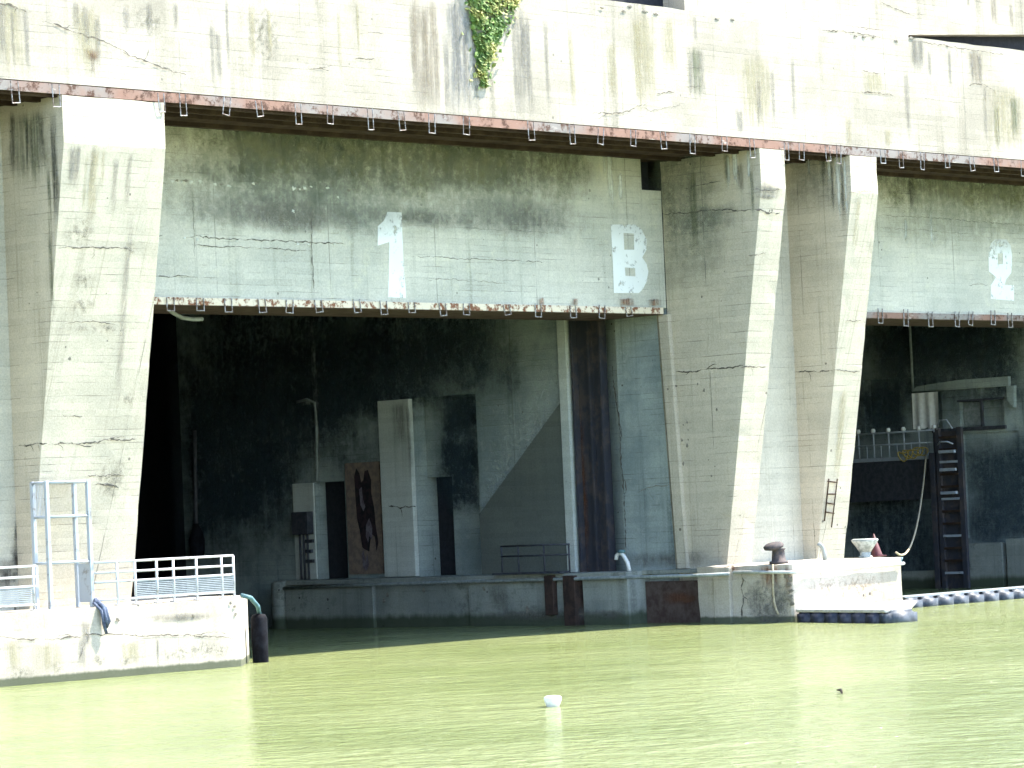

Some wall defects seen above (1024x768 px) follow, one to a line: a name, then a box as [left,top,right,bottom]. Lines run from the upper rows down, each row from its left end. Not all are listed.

crack [1,3,186,75]
damp [449,12,466,86]
damp [11,116,42,171]
crack [192,208,343,292]
crack [677,364,764,375]
crack [25,437,135,452]
corrosion [645,580,701,623]